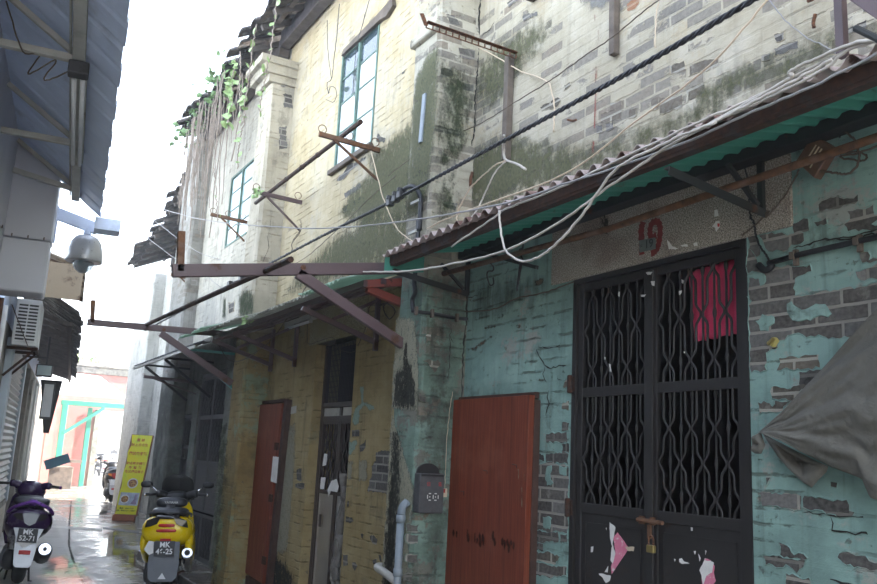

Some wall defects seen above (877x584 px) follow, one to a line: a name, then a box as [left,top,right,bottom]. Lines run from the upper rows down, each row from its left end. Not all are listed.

peeling [759,194,877,253]
peeling [746,248,877,415]
water stain [393,342,416,409]
crack [536,345,566,413]
water stain [382,431,402,584]
peeling [536,400,570,579]
peeling [760,477,855,519]
peeling [762,541,812,584]
peeling [837,550,877,572]